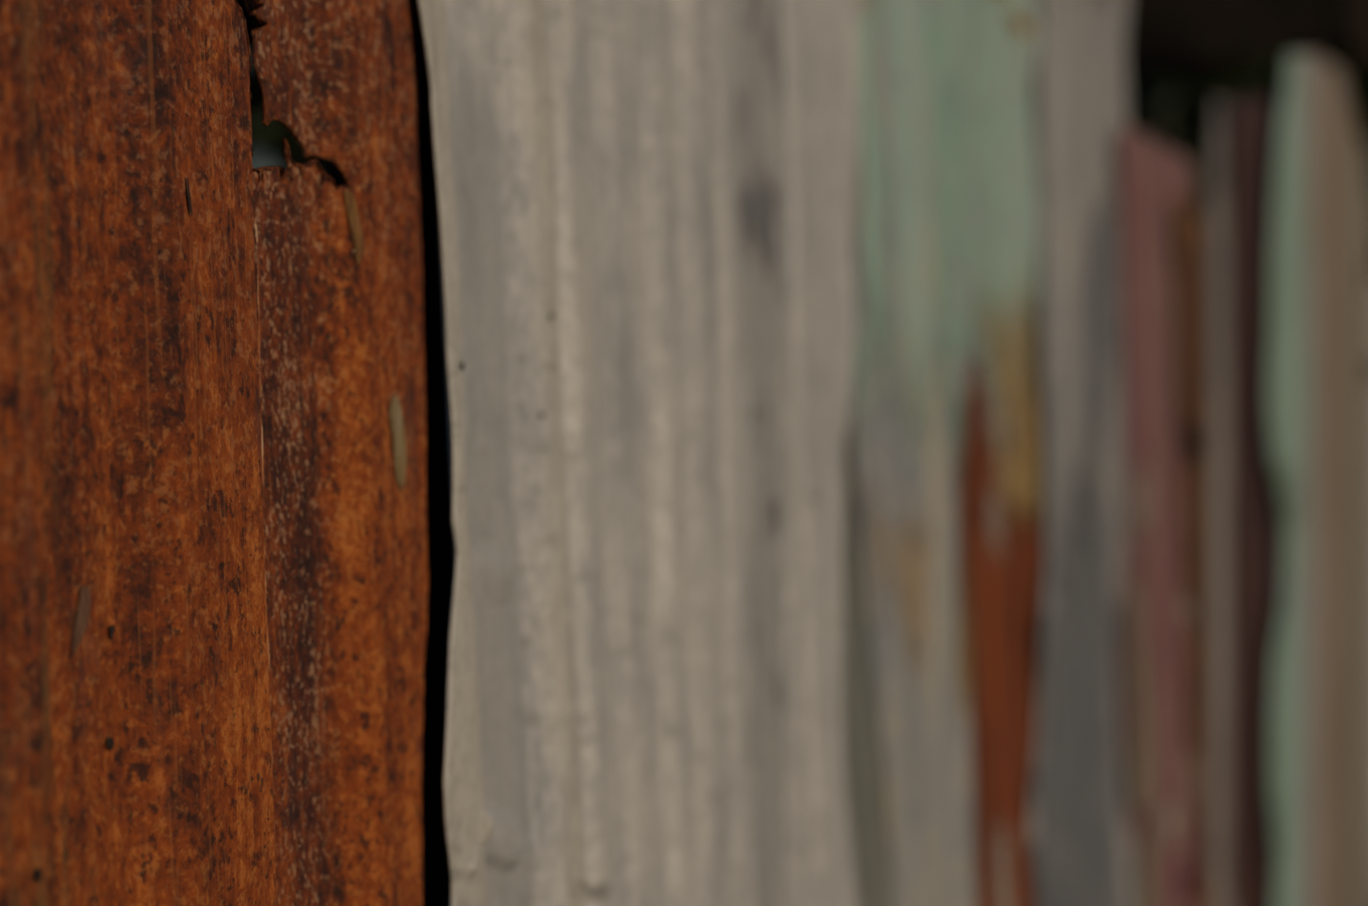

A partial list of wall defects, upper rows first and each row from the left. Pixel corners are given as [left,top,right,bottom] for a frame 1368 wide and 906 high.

rust [959,313,1046,906]